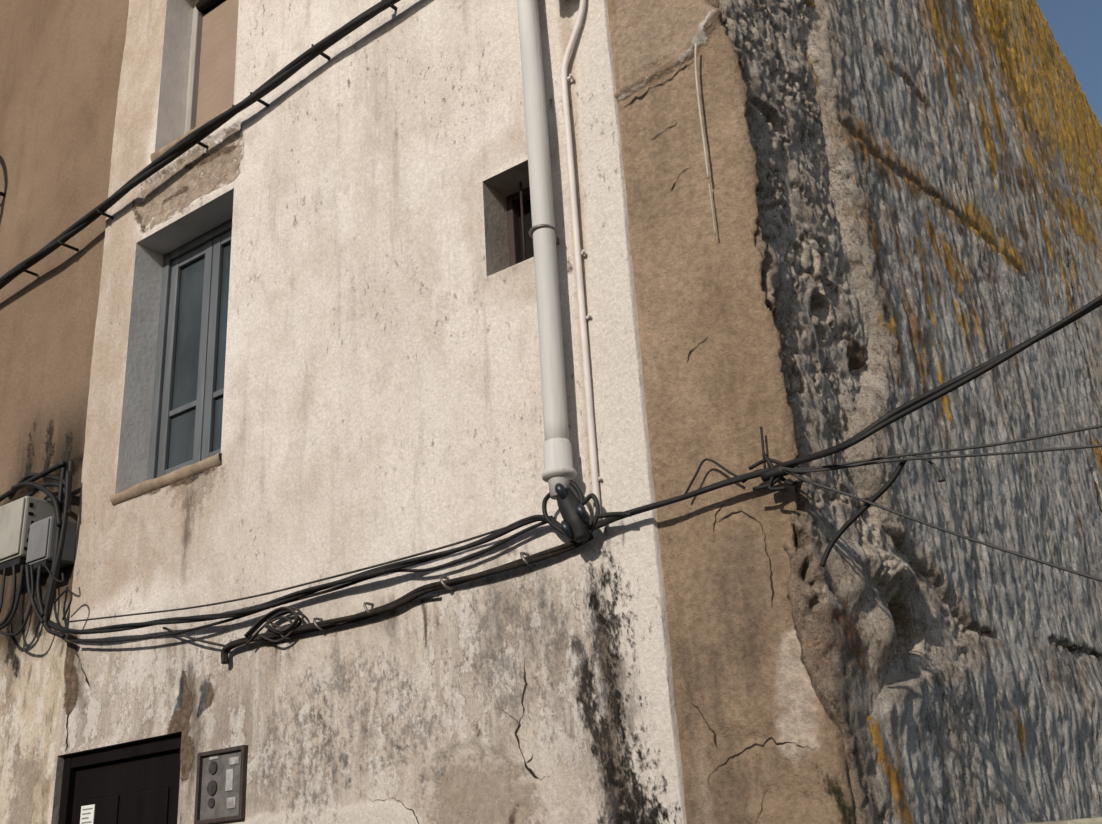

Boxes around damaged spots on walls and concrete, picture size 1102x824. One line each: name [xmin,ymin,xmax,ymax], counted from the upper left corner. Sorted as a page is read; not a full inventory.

peeling [132,125,245,237]
spalling [707,0,998,824]
damp [6,581,47,679]
flaking render [370,750,544,824]
crack [503,658,549,780]
damp [576,543,680,824]
crack [691,702,815,779]
crack [1050,623,1102,658]